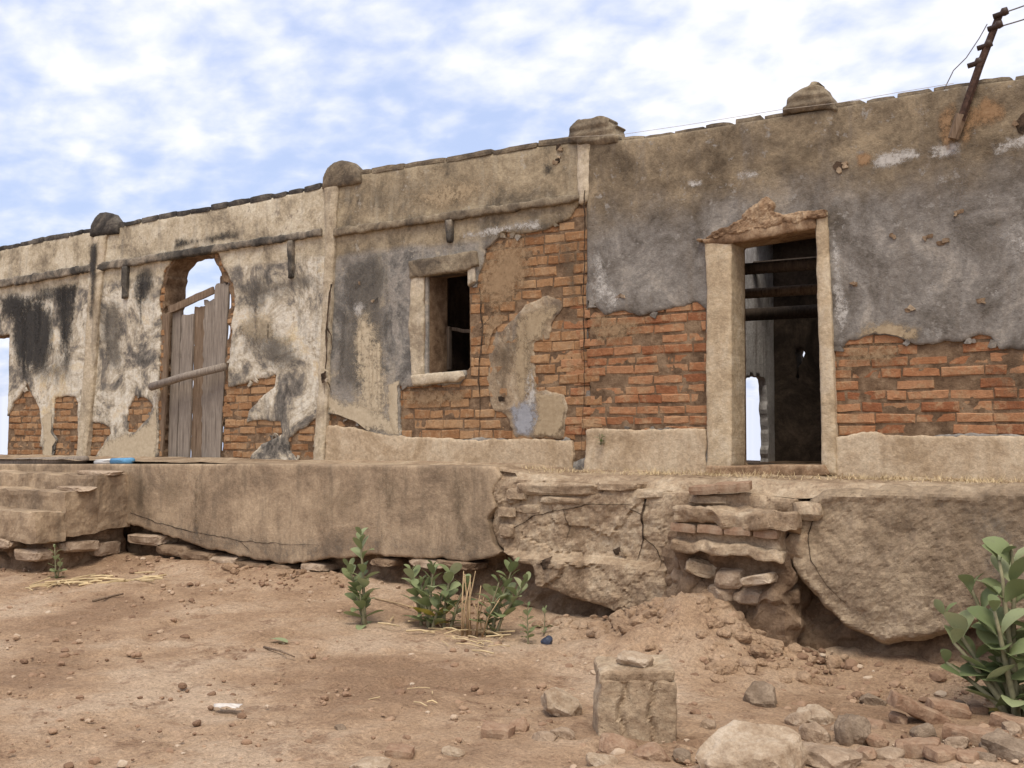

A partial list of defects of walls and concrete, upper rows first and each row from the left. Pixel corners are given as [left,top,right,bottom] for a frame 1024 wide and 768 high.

water stain [1,285,75,377]
flaking render [7,385,78,456]
flaking render [208,253,316,460]
water stain [251,327,294,367]
water stain [244,276,310,307]
water stain [340,258,387,385]
flaking render [321,204,707,462]
flaking render [834,323,1024,437]
crack [131,513,320,550]
crack [514,499,662,566]
crack [808,521,847,605]